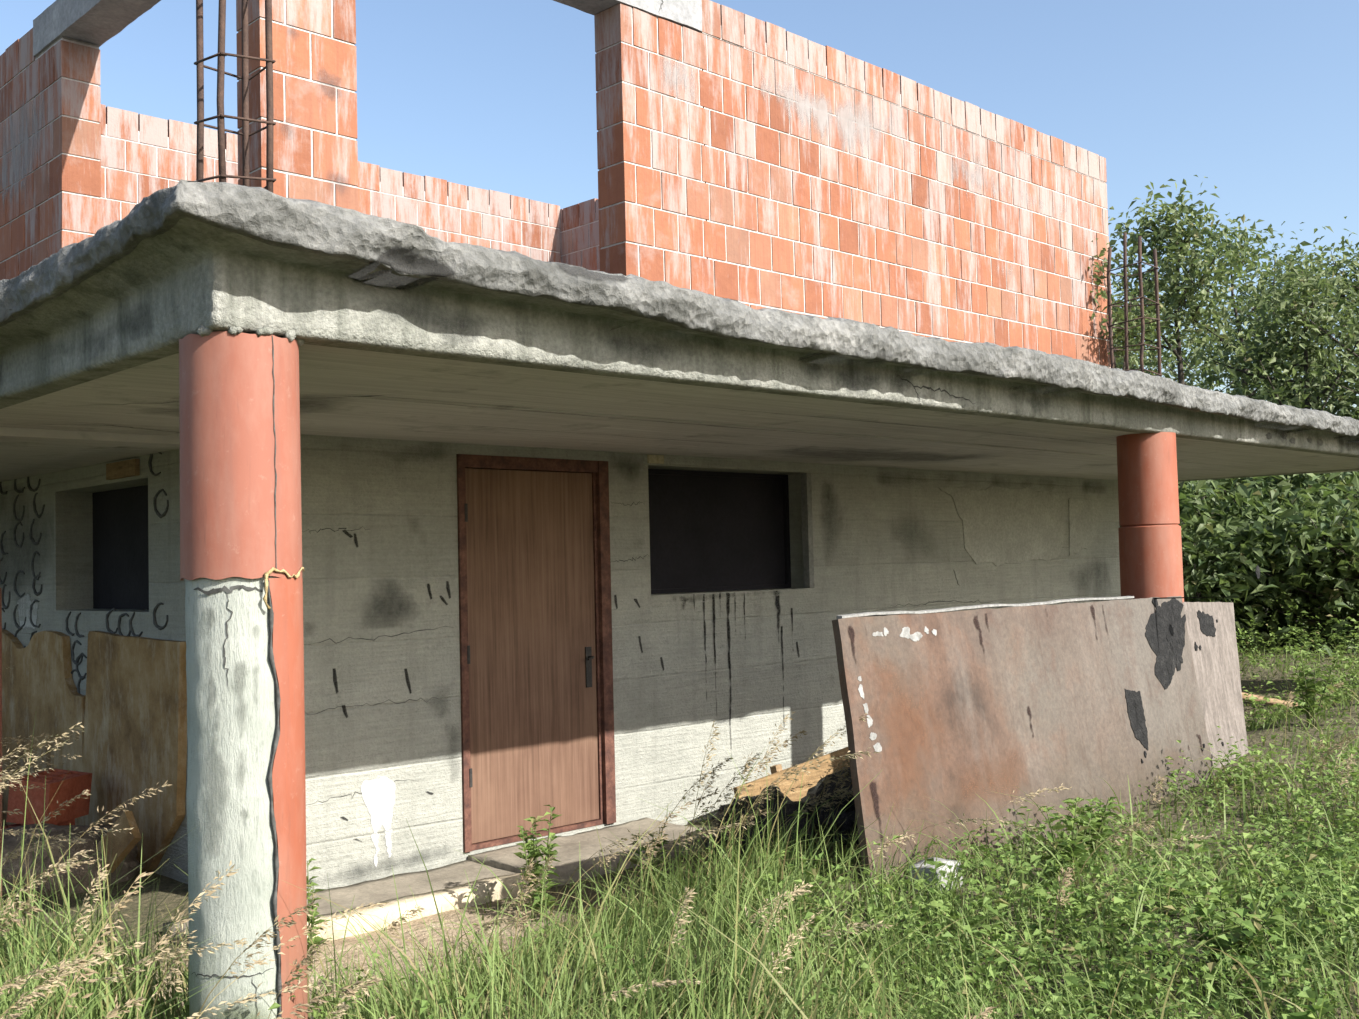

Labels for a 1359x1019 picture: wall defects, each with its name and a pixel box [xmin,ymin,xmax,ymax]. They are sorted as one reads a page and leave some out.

crack [194,335,370,690]
crack [310,697,438,715]
crack [304,626,454,645]
leakage [682,593,746,736]
leakage [775,591,793,709]
peeling [1125,689,1148,764]
peeling [1145,597,1218,690]
peeling [267,580,282,1017]
leakage [358,829,392,874]
crack [191,968,272,1018]